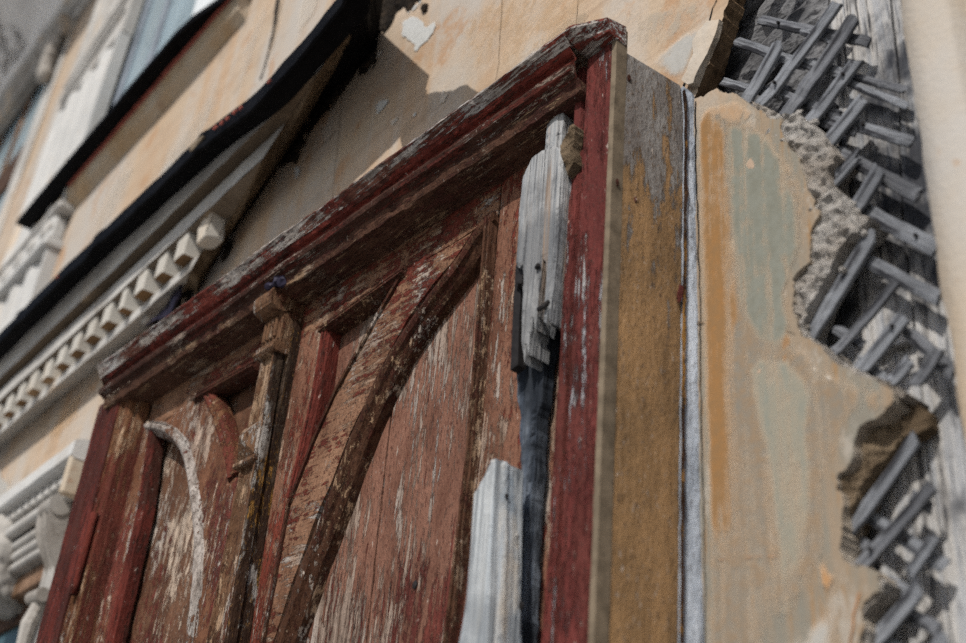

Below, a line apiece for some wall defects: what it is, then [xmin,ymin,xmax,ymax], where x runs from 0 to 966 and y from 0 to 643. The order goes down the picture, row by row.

crack [260,0,279,79]
flaking render [401,1,435,51]
flaking render [717,0,966,643]